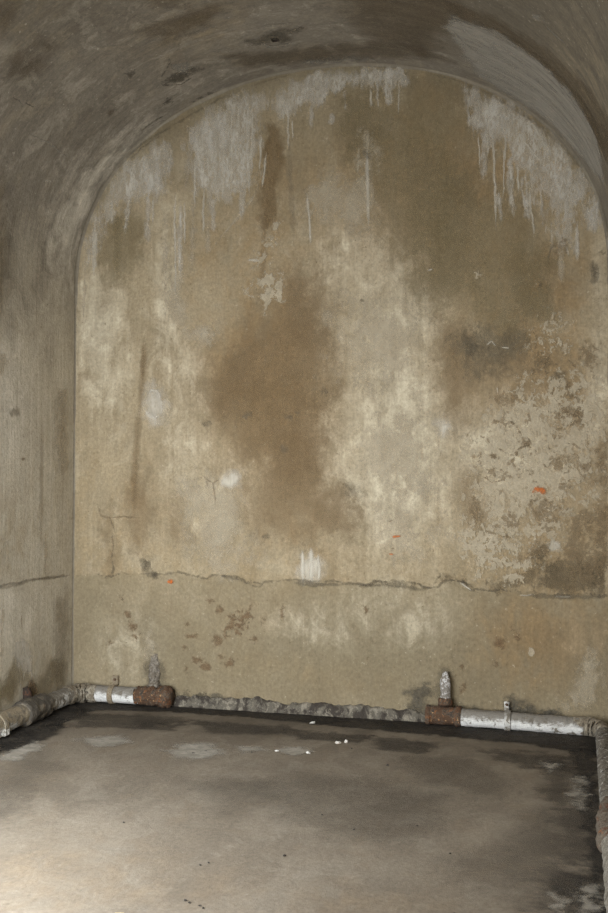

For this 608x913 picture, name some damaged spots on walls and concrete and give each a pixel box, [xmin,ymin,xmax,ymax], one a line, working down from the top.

leakage [190,69,404,314]
leakage [469,101,585,228]
peeling [454,315,607,588]